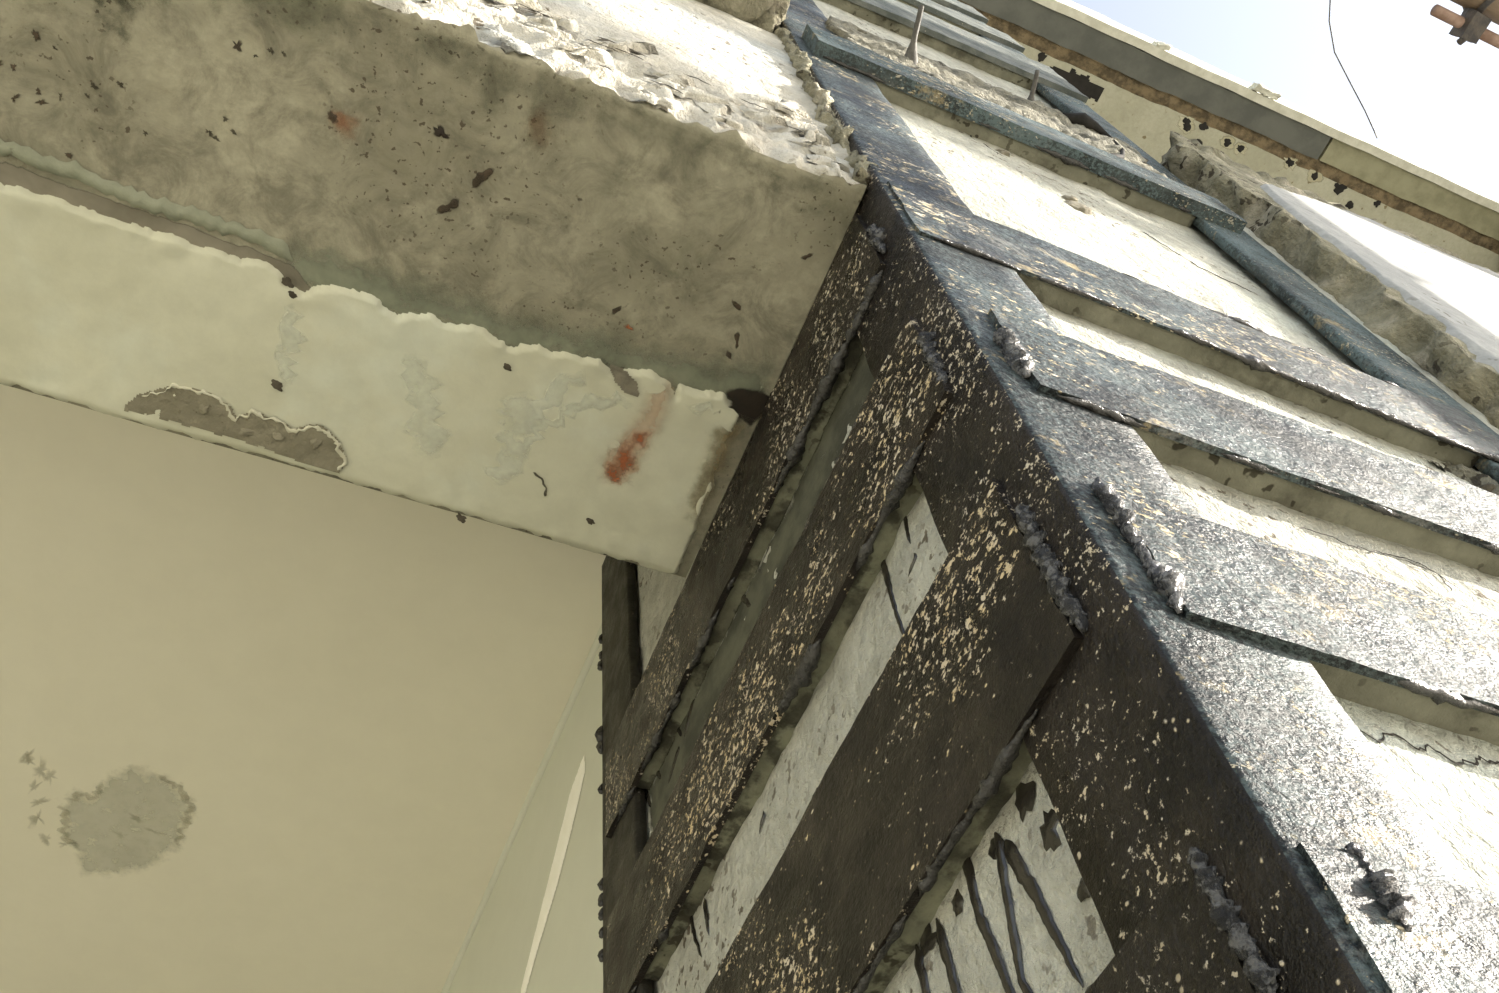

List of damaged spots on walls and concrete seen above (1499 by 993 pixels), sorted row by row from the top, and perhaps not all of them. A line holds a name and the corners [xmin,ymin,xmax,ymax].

spalling [233,40,286,57]
spalling [11,88,62,105]
spalling [476,0,850,178]
peeling [957,0,1499,255]
spalling [472,168,493,188]
spalling [437,199,459,214]
peeling [0,162,310,299]
spalling [124,383,347,473]
rust [606,392,664,482]
spalling [1428,459,1499,495]
crack [1359,729,1499,766]